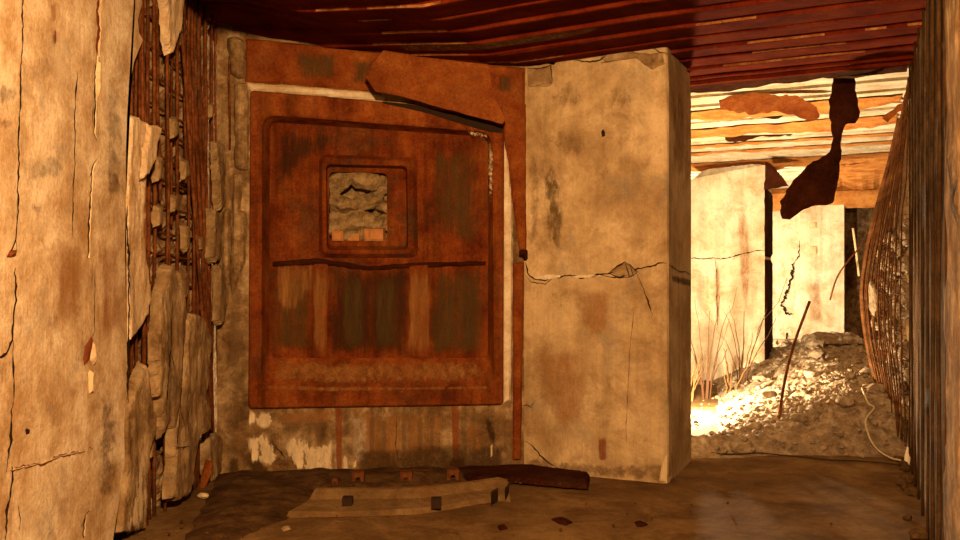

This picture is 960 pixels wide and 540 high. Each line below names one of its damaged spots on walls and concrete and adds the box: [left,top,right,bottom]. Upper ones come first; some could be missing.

crack [72,0,102,258]
crack [0,0,91,540]
spalling [115,0,250,535]
corrosion [278,267,325,348]
corrosion [409,275,429,347]
crack [525,250,763,441]
crack [780,241,800,339]